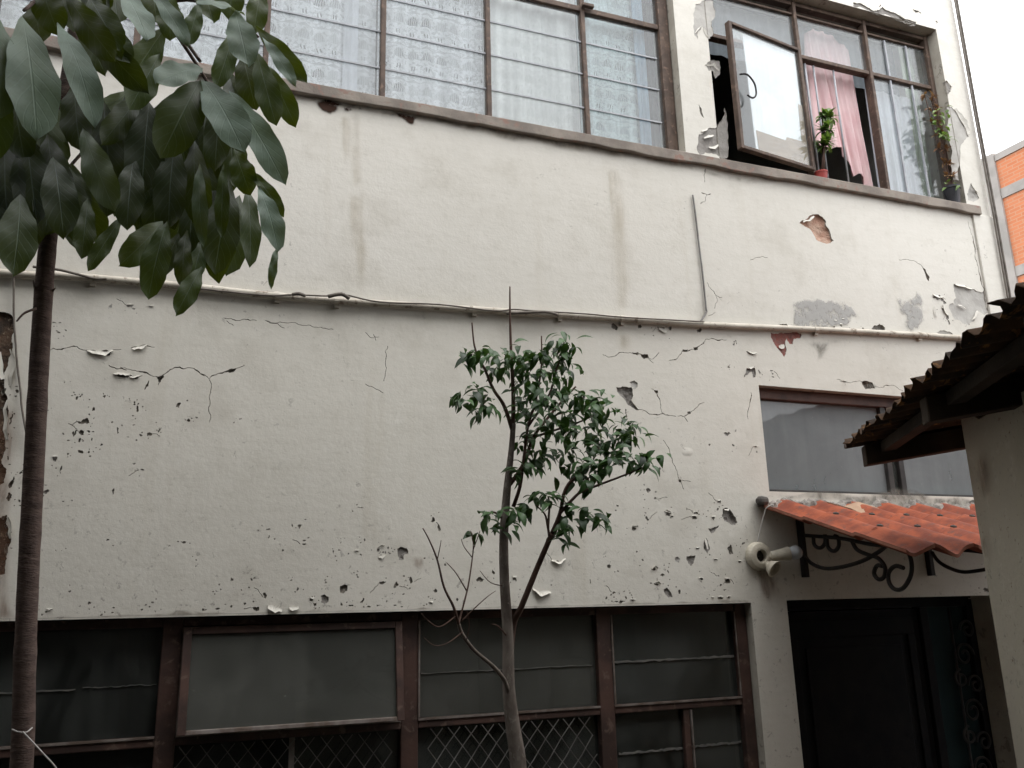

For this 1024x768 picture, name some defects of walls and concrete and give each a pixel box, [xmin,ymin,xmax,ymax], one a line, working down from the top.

peeling [697,106,729,159]
peeling [942,81,979,202]
flaking render [800,214,833,244]
crack [605,285,757,367]
peeling [771,300,885,356]
peeling [899,284,988,335]
crack [51,344,244,422]
crack [841,381,903,391]
peeling [0,312,23,575]
crack [637,390,704,489]
spalling [626,484,747,600]
spalling [202,571,421,613]